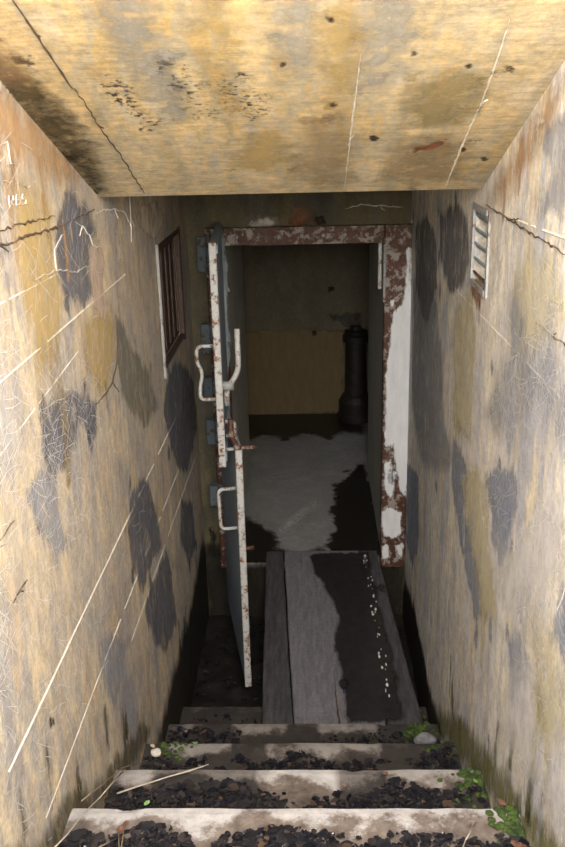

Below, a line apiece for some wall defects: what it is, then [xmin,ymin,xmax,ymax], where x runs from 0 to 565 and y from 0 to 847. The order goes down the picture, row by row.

water stain [0,56,105,194]
crack [0,0,144,281]
crack [445,19,511,187]
crack [487,205,565,255]